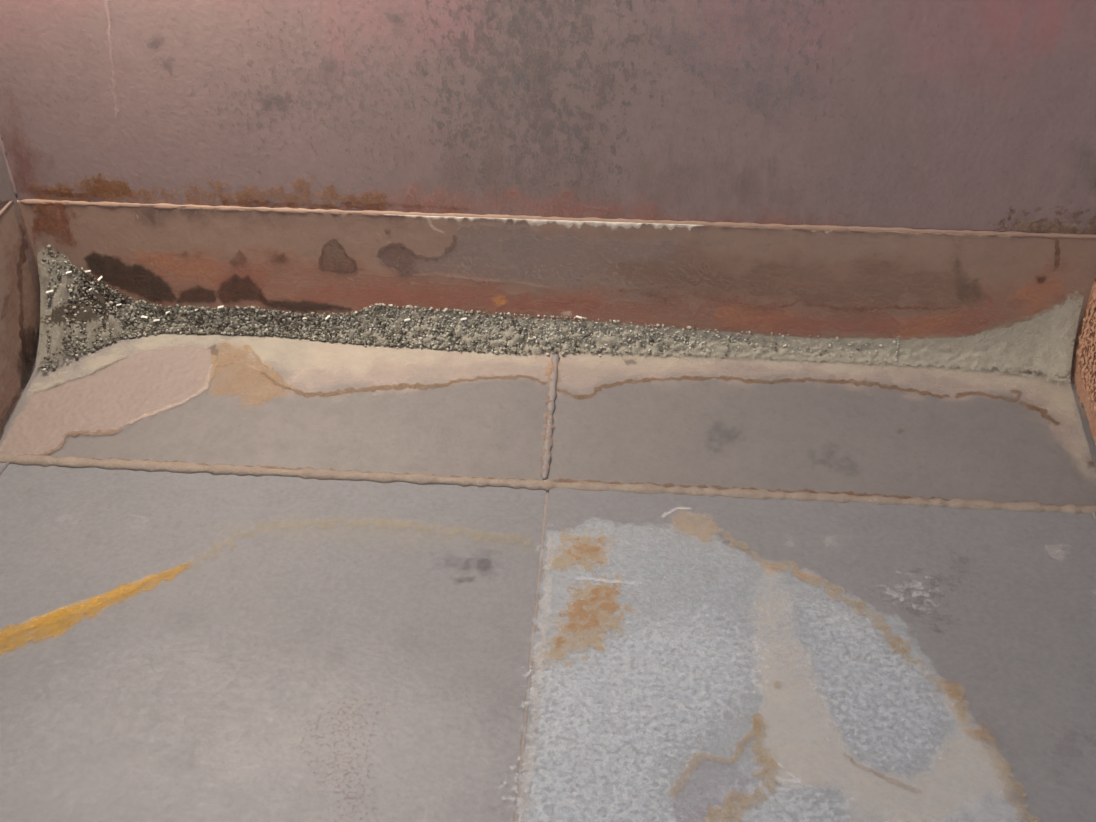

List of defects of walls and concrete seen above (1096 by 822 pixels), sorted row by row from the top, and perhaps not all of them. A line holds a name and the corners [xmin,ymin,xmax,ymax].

corrosion [0,139,171,440]
peeling [0,345,211,456]
corrosion [184,180,467,213]
leakage [34,248,1084,424]
corrosion [994,205,1096,268]
corrosion [1076,276,1096,412]